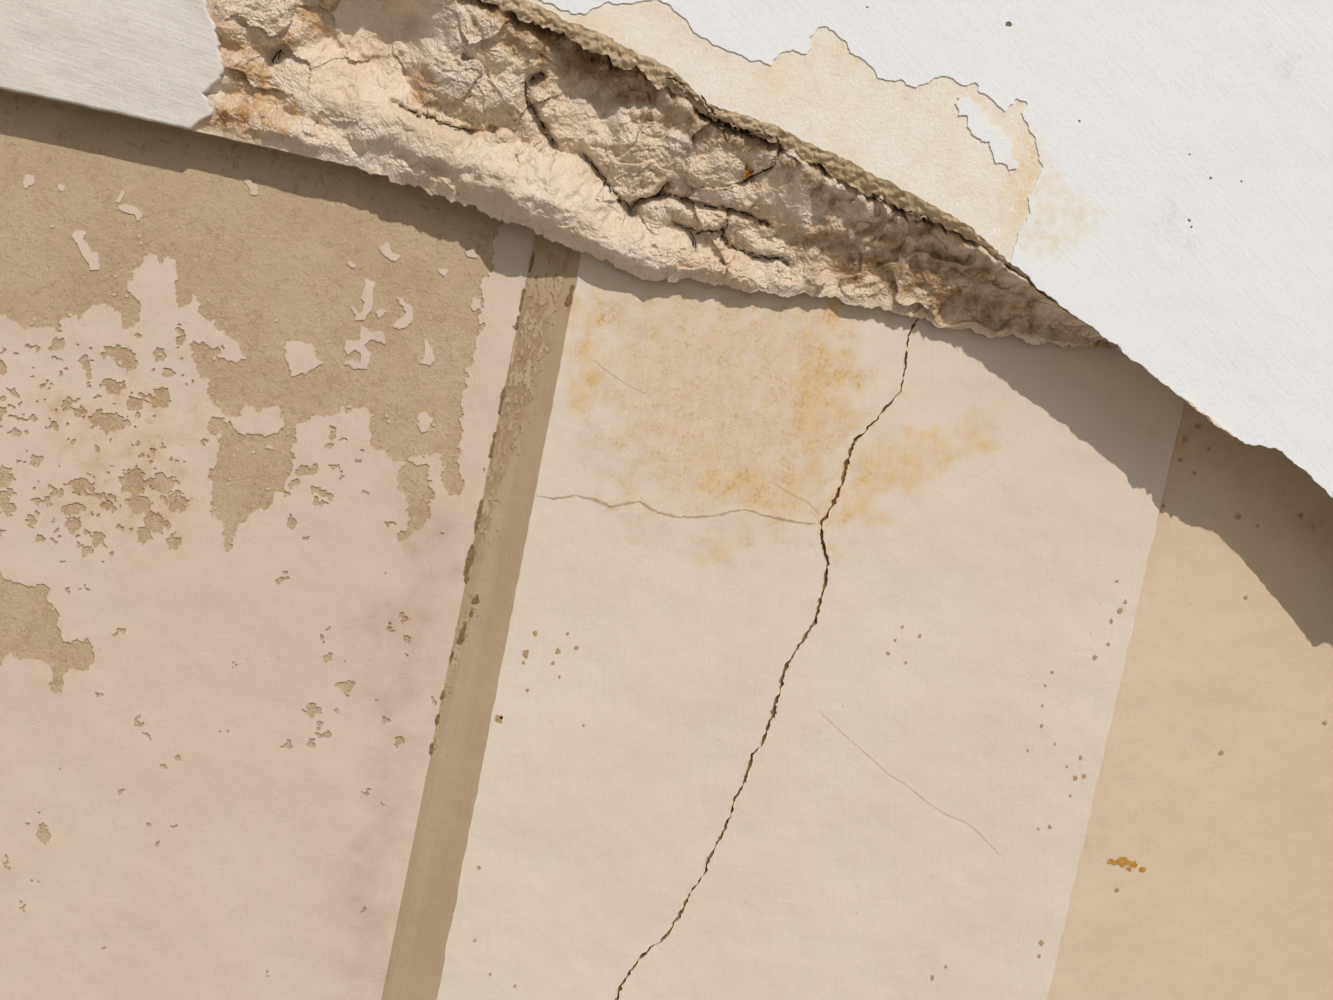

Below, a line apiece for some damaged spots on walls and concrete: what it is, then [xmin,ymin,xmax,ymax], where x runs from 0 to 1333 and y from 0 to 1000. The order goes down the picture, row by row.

spalling [0,0,1128,754]
spalling [1145,368,1258,446]
crack [535,319,920,1000]
peeling [25,812,51,845]
rust [1107,857,1146,873]